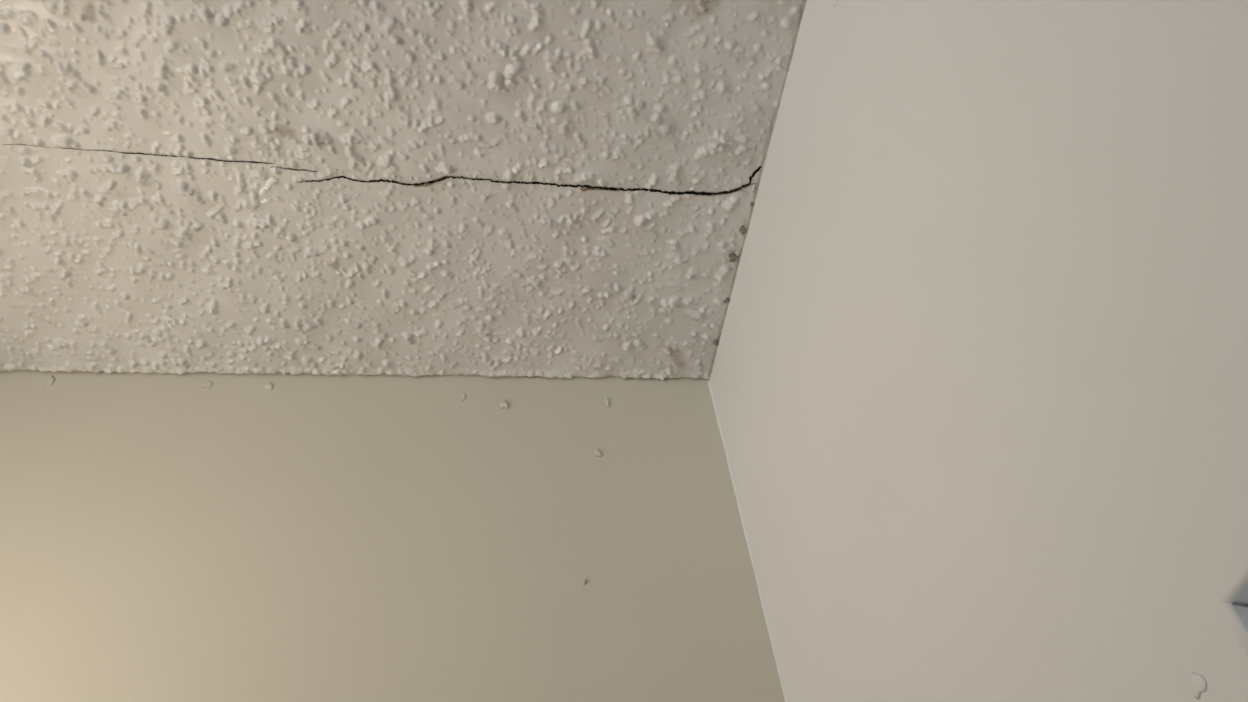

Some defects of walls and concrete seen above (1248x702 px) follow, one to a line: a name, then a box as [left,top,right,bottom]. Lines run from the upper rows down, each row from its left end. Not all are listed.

crack [2,144,762,196]